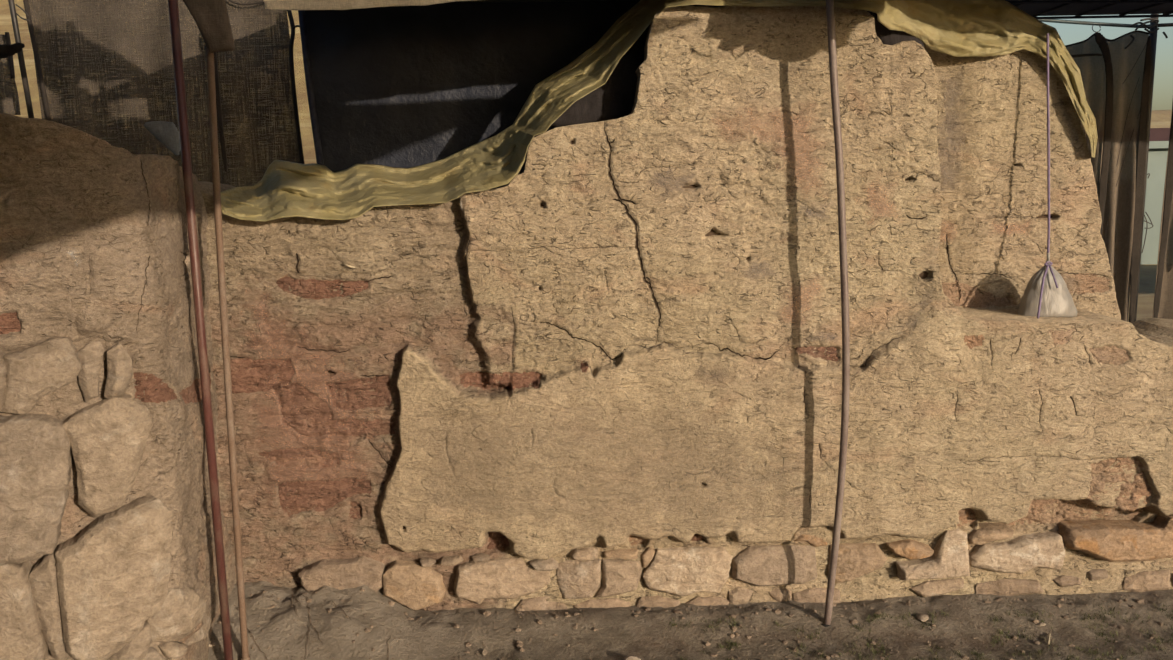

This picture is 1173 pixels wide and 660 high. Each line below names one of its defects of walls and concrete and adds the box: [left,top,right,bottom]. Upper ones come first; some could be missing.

crack [465,129,779,375]
spalling [276,276,368,300]
spalling [230,358,395,519]
spalling [957,508,976,526]
spalling [1007,457,1153,525]